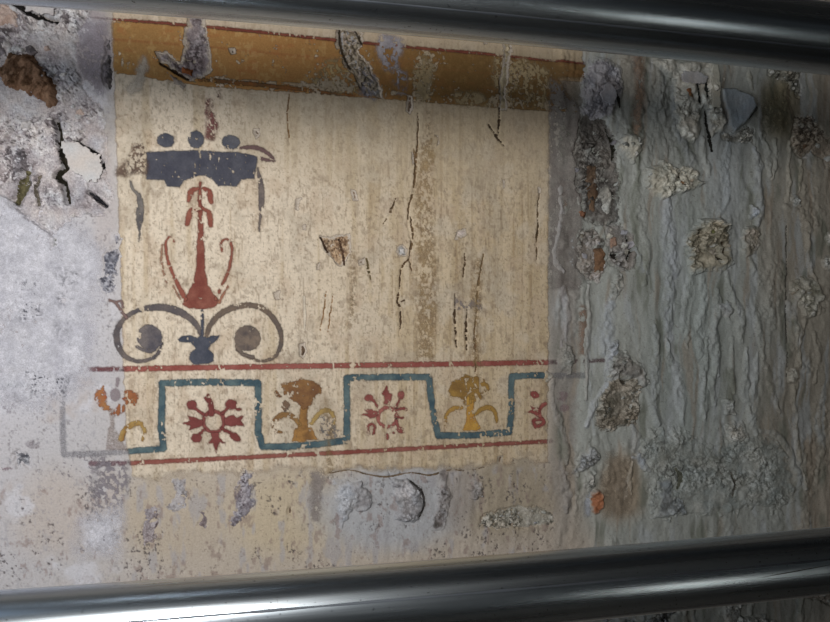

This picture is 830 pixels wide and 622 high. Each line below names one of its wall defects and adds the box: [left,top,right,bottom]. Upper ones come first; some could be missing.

spalling [156,18,211,90]
spalling [336,30,381,98]
spalling [0,4,115,246]
crack [488,107,504,146]
spalling [789,114,830,170]
spalling [320,235,350,266]
crack [383,113,419,329]
spalling [572,114,637,284]
crack [453,253,484,372]
damp [544,55,830,523]
spalling [594,378,643,433]